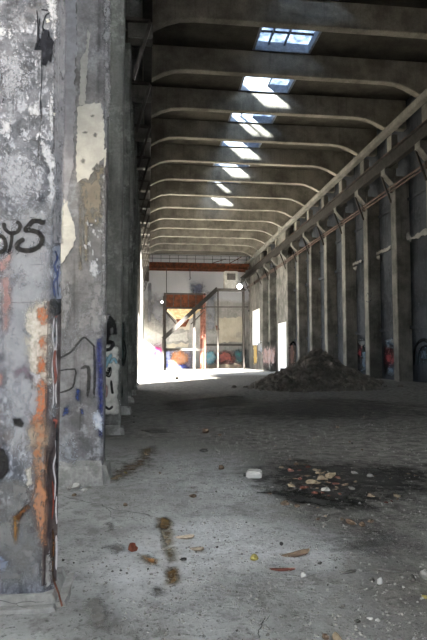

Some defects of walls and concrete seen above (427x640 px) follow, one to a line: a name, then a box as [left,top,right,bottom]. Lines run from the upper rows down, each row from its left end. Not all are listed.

flaking render [0,0,107,264]
corrosion [13,336,48,545]
peeling [24,301,52,390]
corrosion [36,307,48,325]